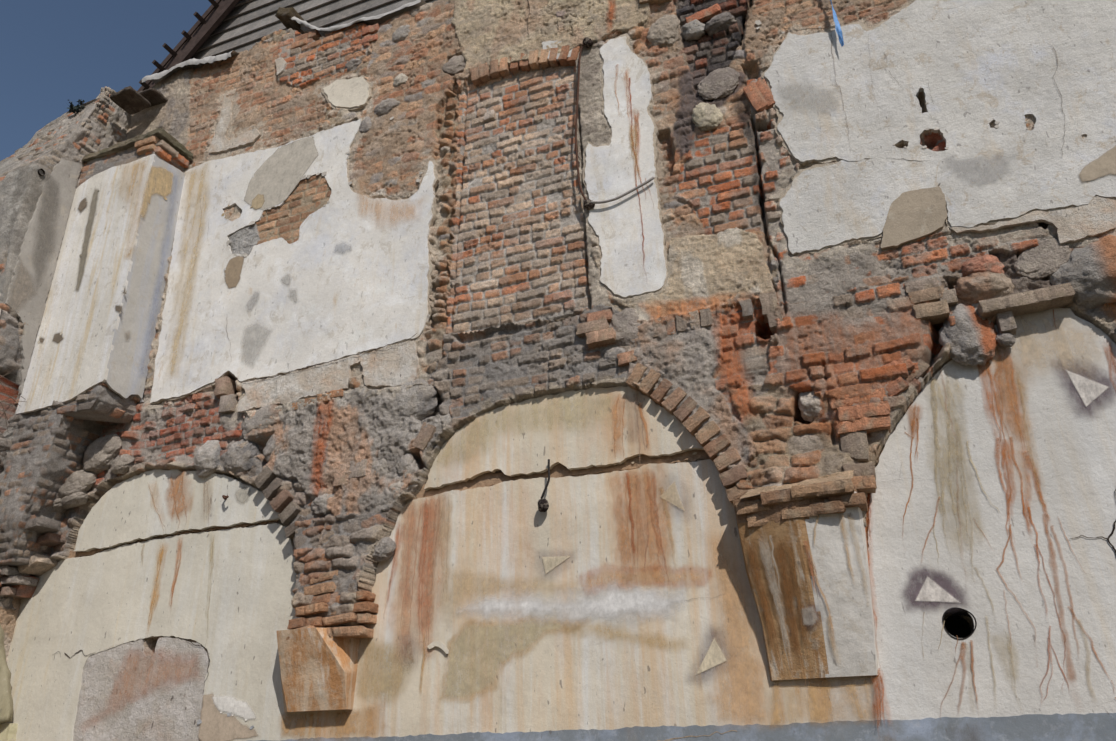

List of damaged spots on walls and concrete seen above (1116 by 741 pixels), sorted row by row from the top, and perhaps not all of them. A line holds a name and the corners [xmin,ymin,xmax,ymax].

spalling [221,135,331,288]
corrosion [615,73,644,253]
spalling [893,128,949,152]
corrosion [169,473,187,519]
corrosion [620,473,667,572]
corrosion [903,412,919,521]
corrosion [981,360,1082,696]
crack [1071,489,1116,554]
corrosion [395,500,449,688]
peeling [197,694,257,741]
corrosion [955,635,977,701]